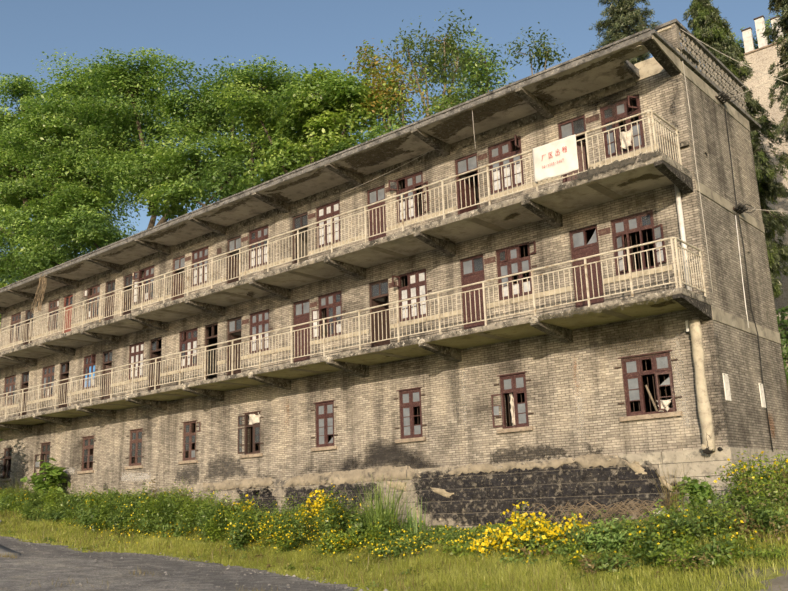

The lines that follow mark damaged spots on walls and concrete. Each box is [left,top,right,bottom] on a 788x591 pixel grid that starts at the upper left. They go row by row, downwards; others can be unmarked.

flaking render [439,454,647,477]
flaking render [203,477,272,491]
flaking render [283,465,421,491]
spalling [430,487,454,498]
water stain [412,445,688,525]